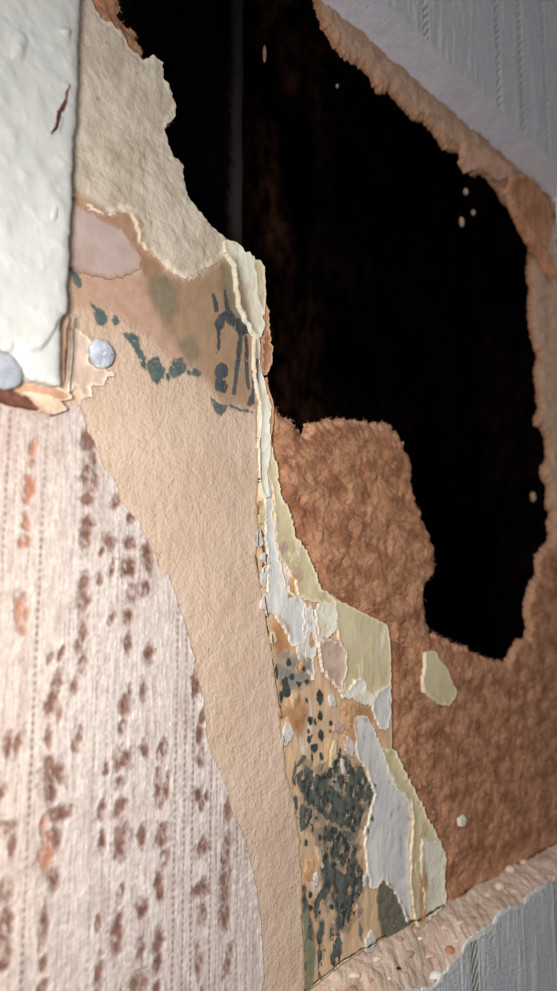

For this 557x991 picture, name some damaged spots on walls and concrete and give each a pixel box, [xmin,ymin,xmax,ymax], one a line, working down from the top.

spalling [68,199,142,280]
damp [70,192,259,416]
peeling [223,239,557,991]
mould [275,653,376,990]
mould [377,881,410,937]